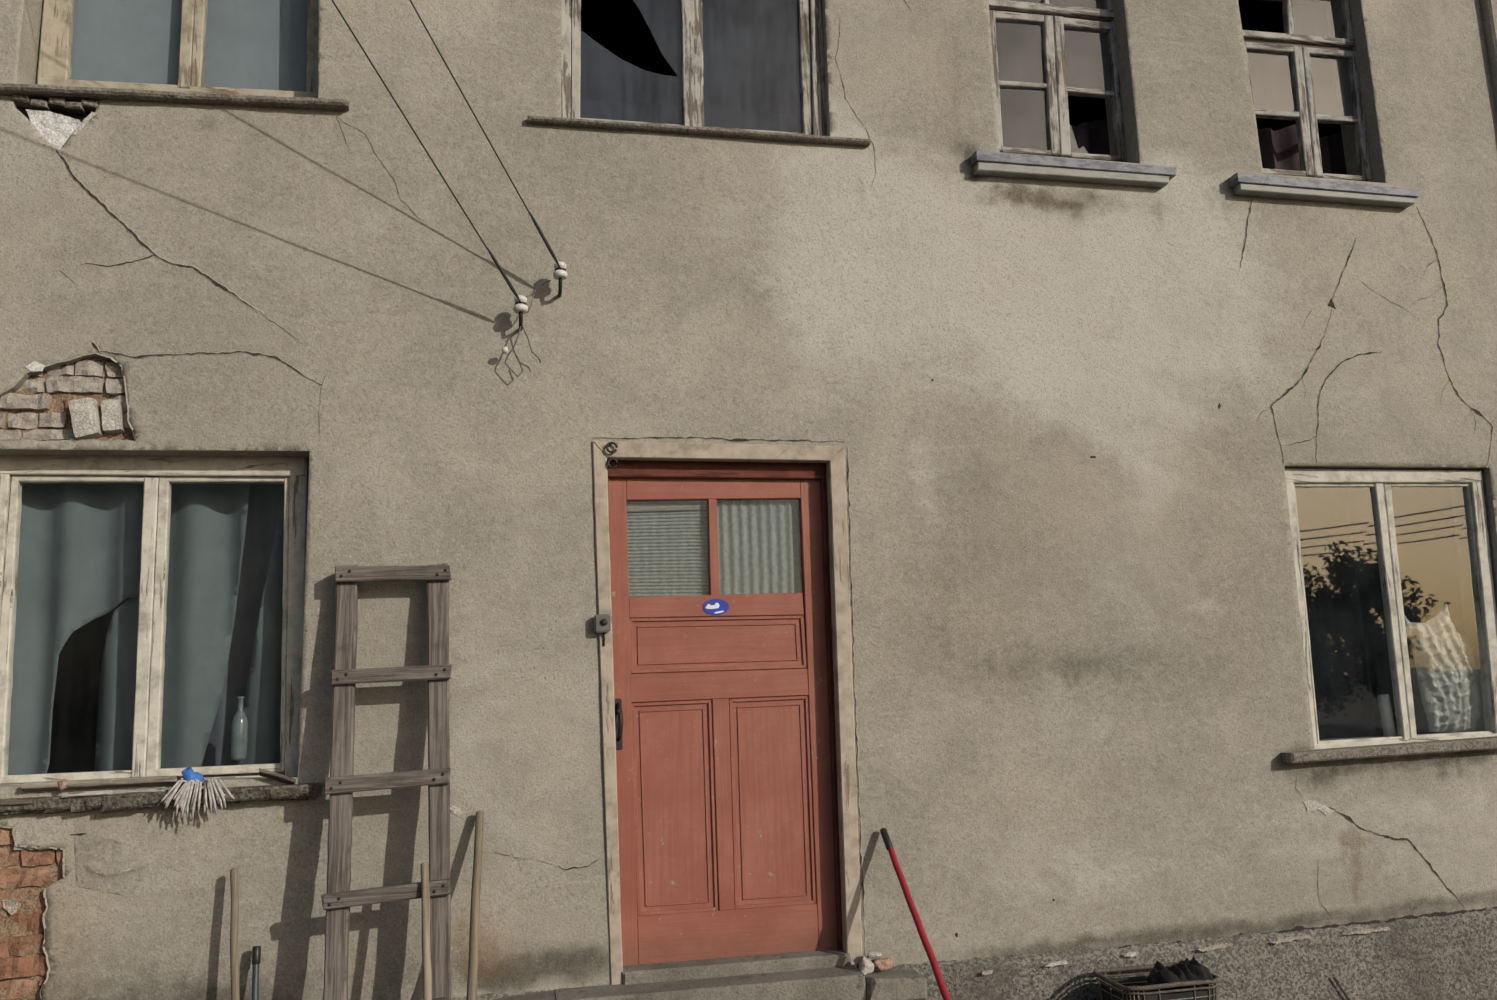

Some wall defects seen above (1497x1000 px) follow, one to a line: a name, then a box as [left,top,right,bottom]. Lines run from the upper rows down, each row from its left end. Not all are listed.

spalling [11,94,99,149]
spalling [0,353,136,442]
crack [56,150,328,435]
crack [1240,199,1254,268]
crack [1255,207,1493,468]
flaking render [0,797,240,1000]
crack [1218,779,1497,939]